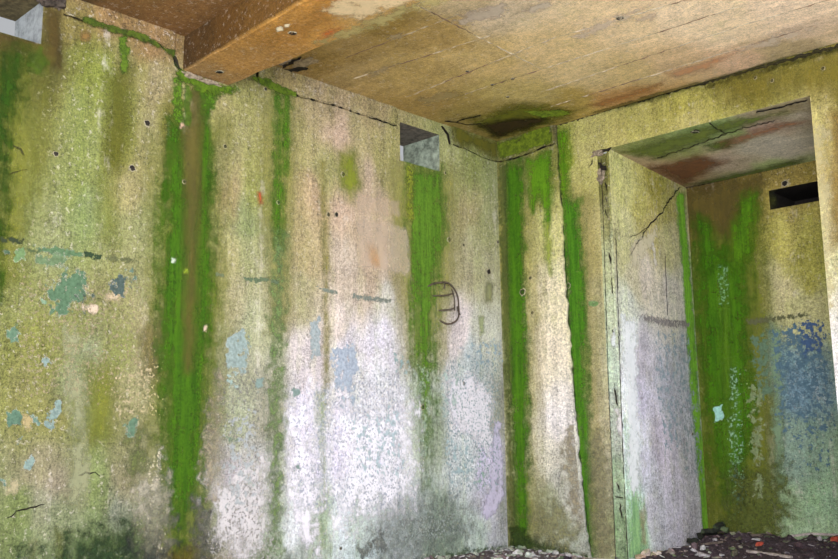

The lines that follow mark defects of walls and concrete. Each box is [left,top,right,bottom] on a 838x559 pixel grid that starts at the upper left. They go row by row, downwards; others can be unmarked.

damp [0,7,61,236]
peeling [0,237,166,445]
damp [56,74,224,559]
damp [358,129,615,559]
crack [601,162,794,558]
damp [687,175,797,536]